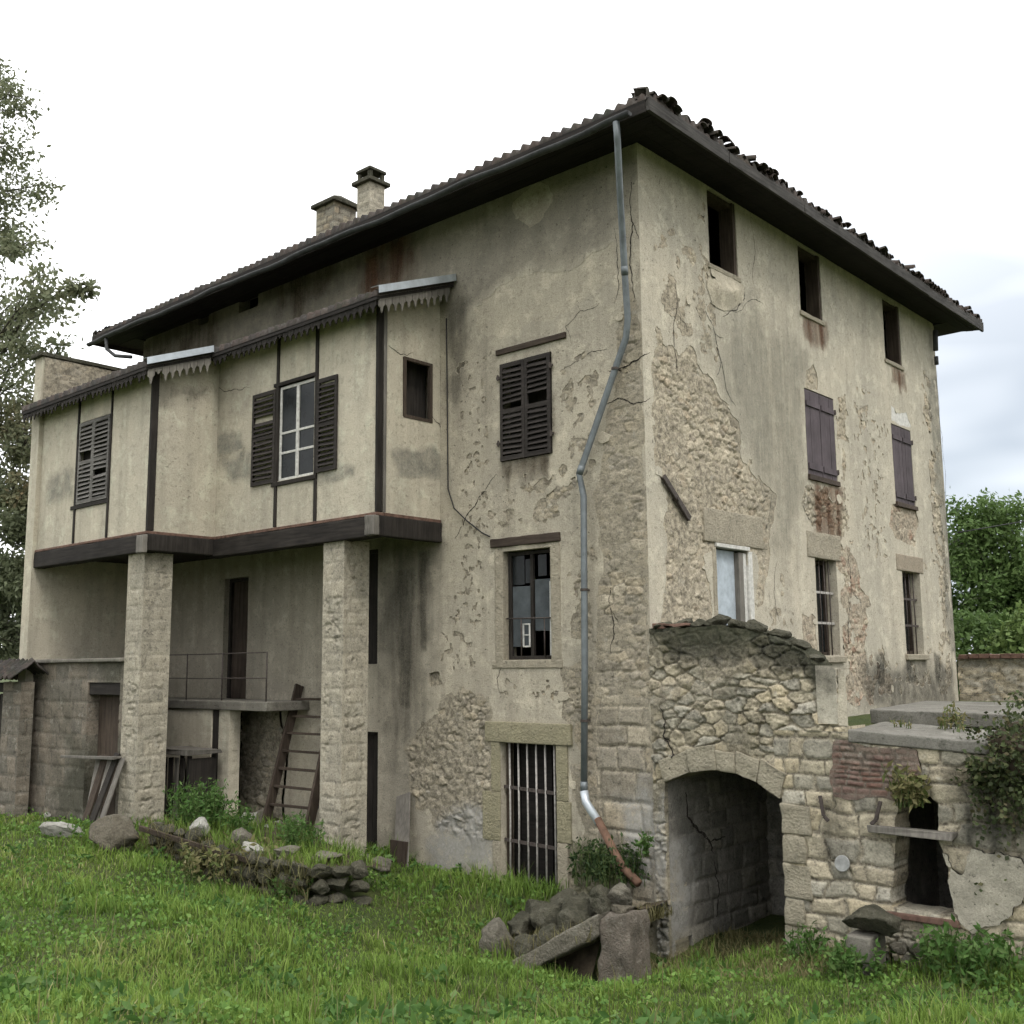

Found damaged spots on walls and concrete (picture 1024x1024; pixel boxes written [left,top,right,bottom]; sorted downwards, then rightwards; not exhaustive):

crack [565,182,649,372]
crack [673,225,760,406]
flaking render [403,228,819,952]
flaking render [802,371,952,707]
crack [685,792,725,917]